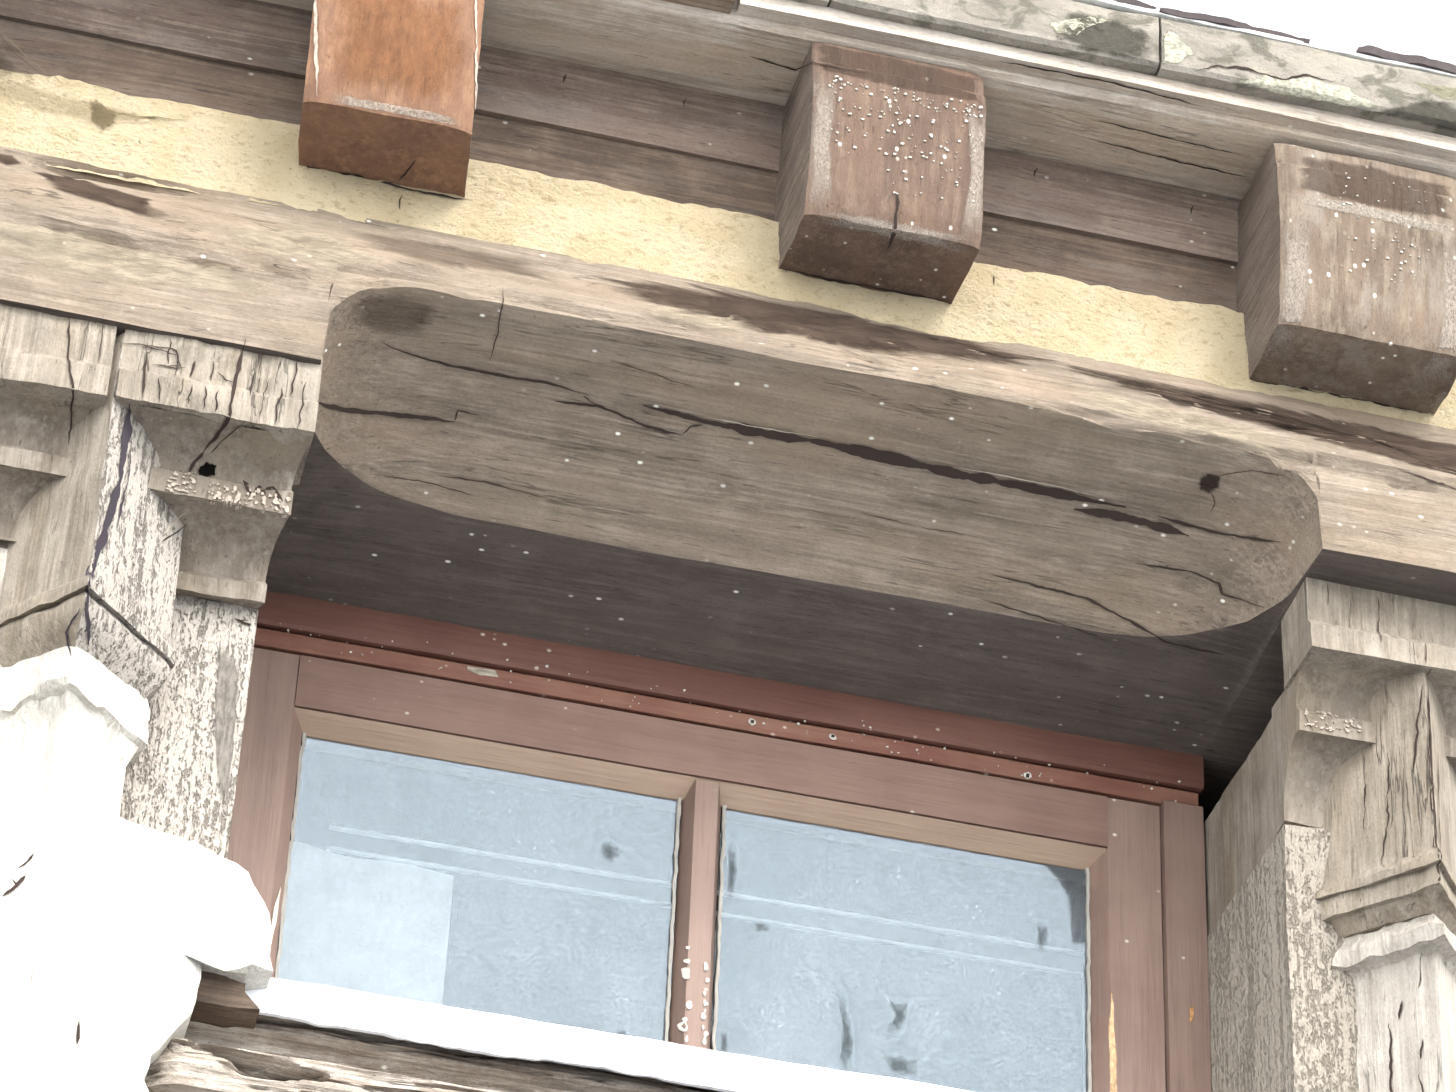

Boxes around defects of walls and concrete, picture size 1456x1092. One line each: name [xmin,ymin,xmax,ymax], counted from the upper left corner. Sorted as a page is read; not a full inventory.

leakage [1064,13,1146,56]
leakage [1377,101,1456,131]
leakage [0,154,20,164]
leakage [36,172,149,213]
leakage [609,279,1053,364]
crack [65,315,478,655]
crack [374,294,1278,607]
leakage [1071,366,1456,474]
crack [982,574,1223,655]
crack [1363,643,1442,885]